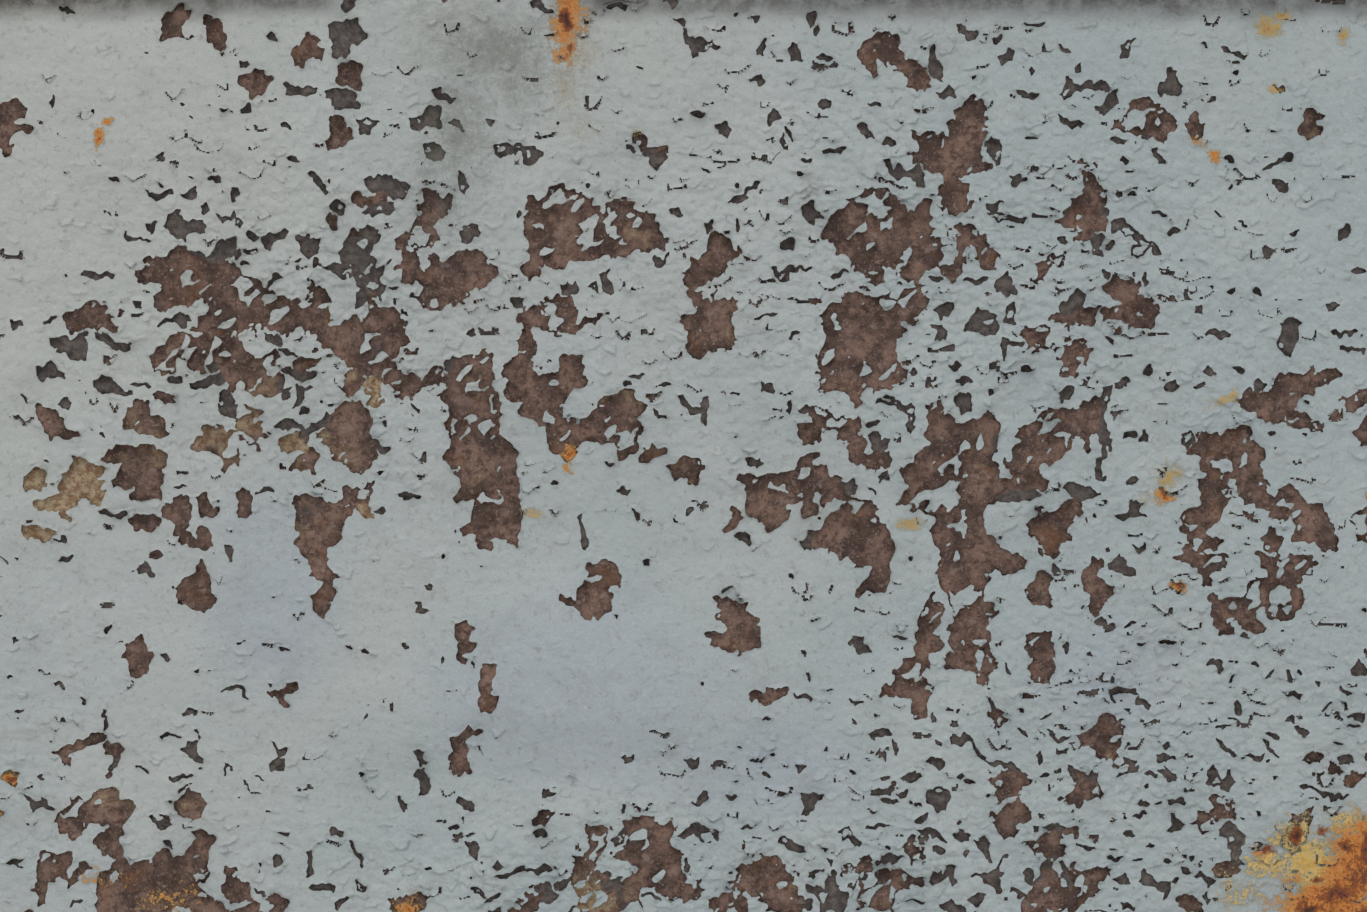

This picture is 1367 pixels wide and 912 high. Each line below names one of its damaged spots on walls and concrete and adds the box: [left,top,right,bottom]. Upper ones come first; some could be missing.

corrosion [547,0,592,66]
peeling [0,77,55,161]
peeling [0,315,30,337]
peeling [12,0,790,627]
peeling [104,625,170,695]
peeling [0,678,303,912]
peeling [222,735,322,798]
peeling [318,820,351,847]
peeling [330,866,442,912]
corrosion [1205,798,1367,912]